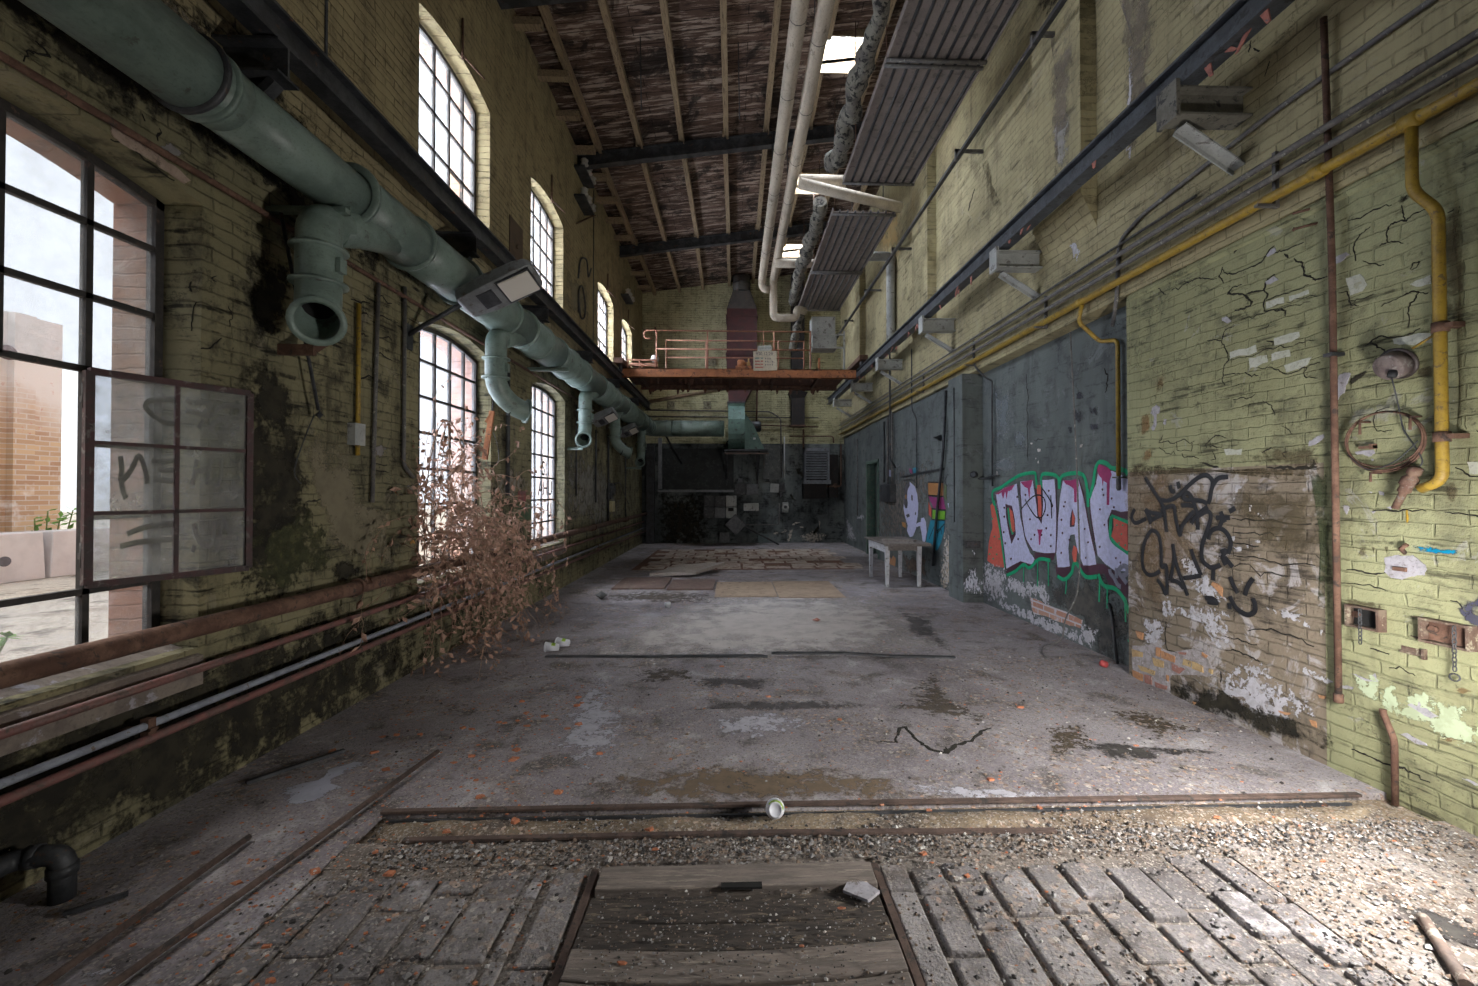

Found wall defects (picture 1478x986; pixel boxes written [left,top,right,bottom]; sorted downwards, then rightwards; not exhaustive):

flaking render [1265,276,1309,309]
flaking render [1230,332,1311,373]
crack [1158,204,1454,470]
flaking render [1393,333,1432,345]
leakage [215,361,310,599]
crack [1374,509,1478,517]
flaking render [1030,598,1083,628]
leakage [1266,607,1323,635]
flaking render [1132,631,1213,691]
leakage [1215,663,1314,720]
leakage [1299,667,1333,684]
crack [880,726,992,754]